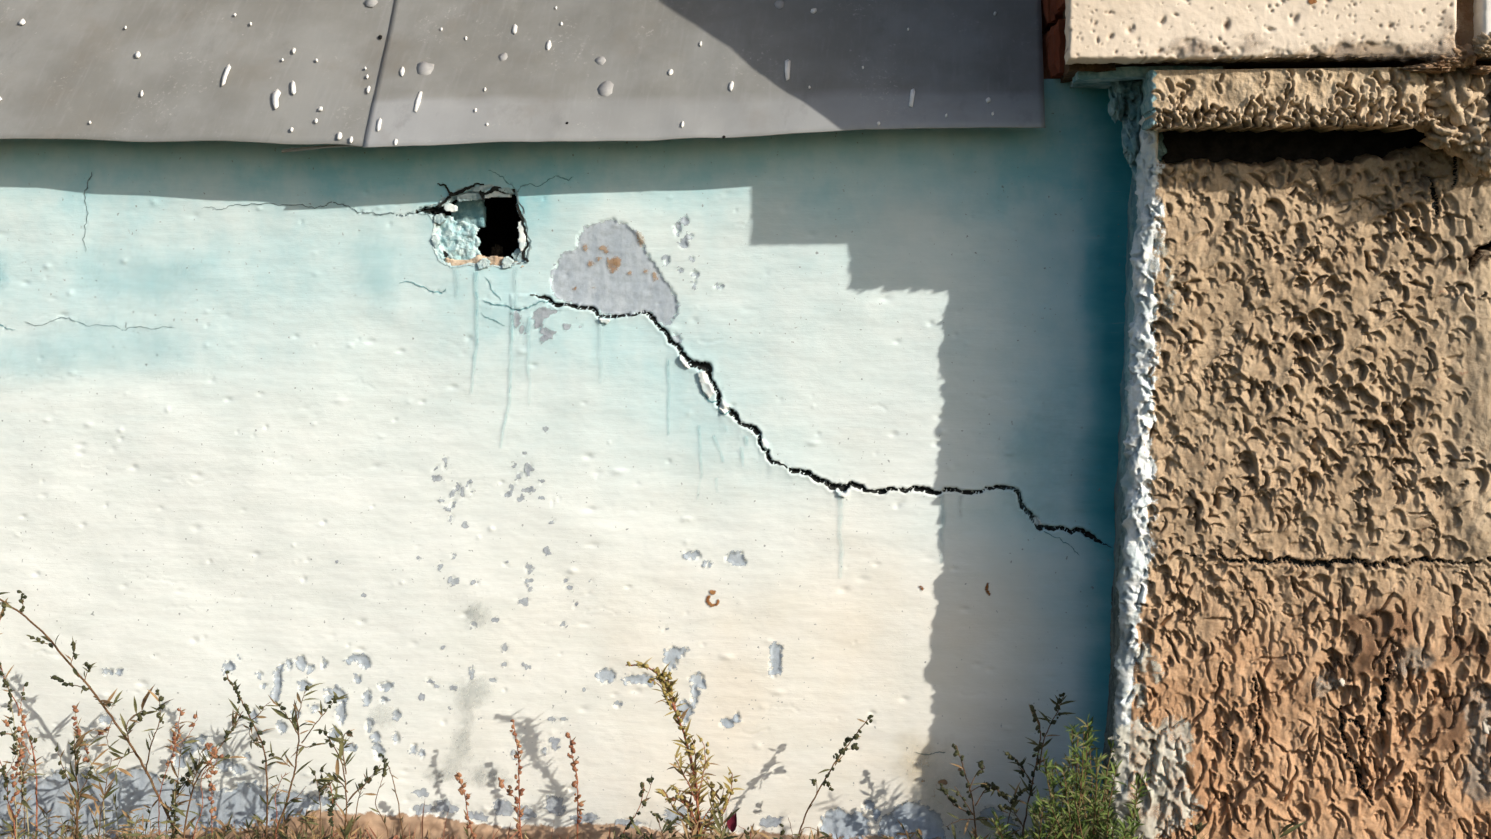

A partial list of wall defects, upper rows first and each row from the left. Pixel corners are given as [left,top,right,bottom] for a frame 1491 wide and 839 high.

crack [400,281,446,294]
spalling [416,183,532,269]
peeling [510,214,725,344]
spalling [1466,242,1491,269]
crack [482,277,1112,555]
crack [1185,553,1491,568]
peeling [255,653,425,758]
peeling [663,647,706,726]
crack [1222,677,1262,779]
crack [1338,657,1391,805]
peeling [411,788,714,828]
peeling [820,800,945,839]